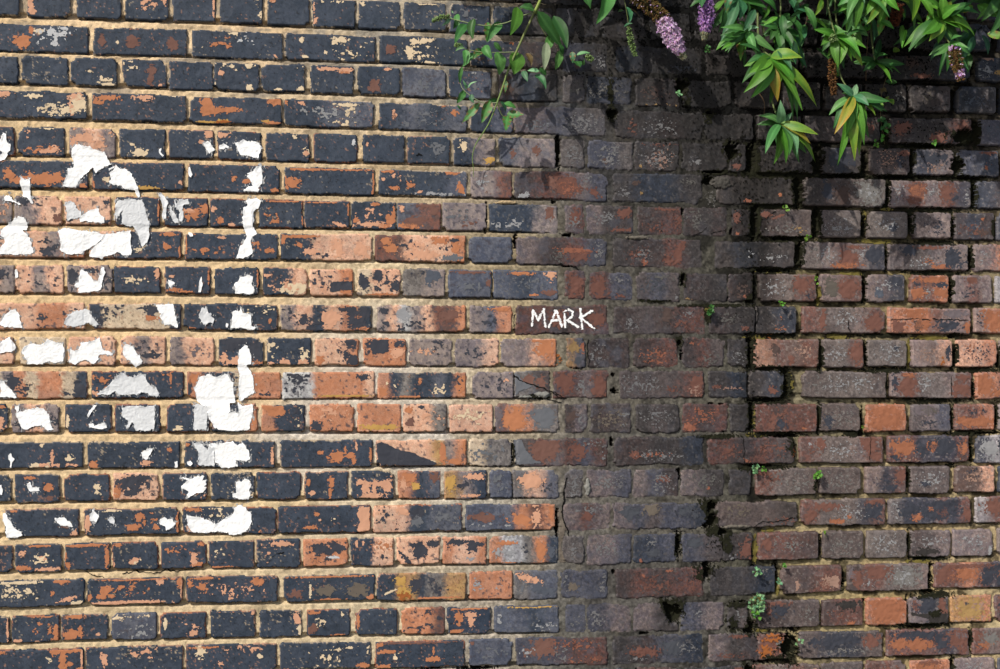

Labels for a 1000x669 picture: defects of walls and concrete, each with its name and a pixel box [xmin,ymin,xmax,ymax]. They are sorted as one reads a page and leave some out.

peeling [1,161,65,187]
peeling [157,200,235,259]
water stain [531,0,1000,420]
peeling [153,268,193,293]
peeling [252,356,325,365]
peeling [379,378,445,426]
peeling [24,449,98,492]
crack [561,478,569,536]
peeling [0,515,374,669]
peeling [356,643,400,668]